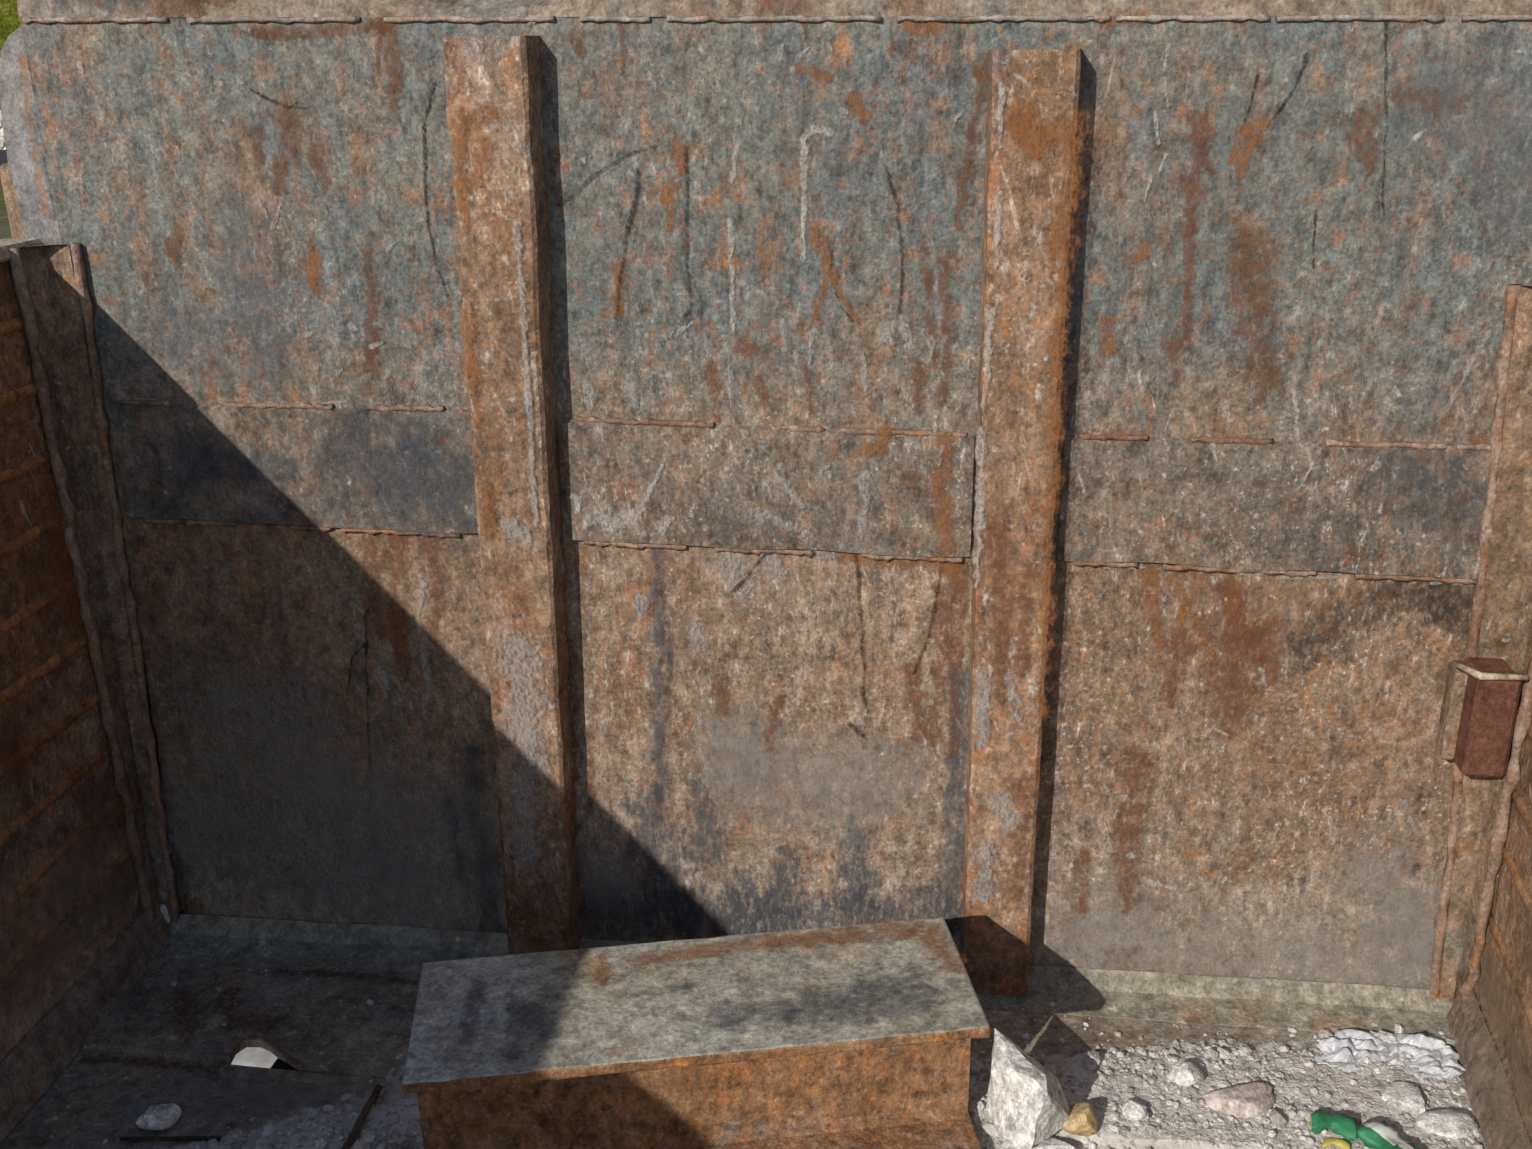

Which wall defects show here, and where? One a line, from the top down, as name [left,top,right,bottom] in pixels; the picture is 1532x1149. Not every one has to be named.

crack [422,82,448,295]
crack [558,145,691,341]
rust [954,56,989,229]
rust [987,98,1089,718]
rust [1163,113,1270,375]
rust [1226,224,1283,406]
crack [1240,53,1309,130]
crack [1380,20,1388,209]
leakage [572,464,1023,939]
crack [847,553,868,738]
crack [913,571,941,674]
rust [1138,566,1471,737]